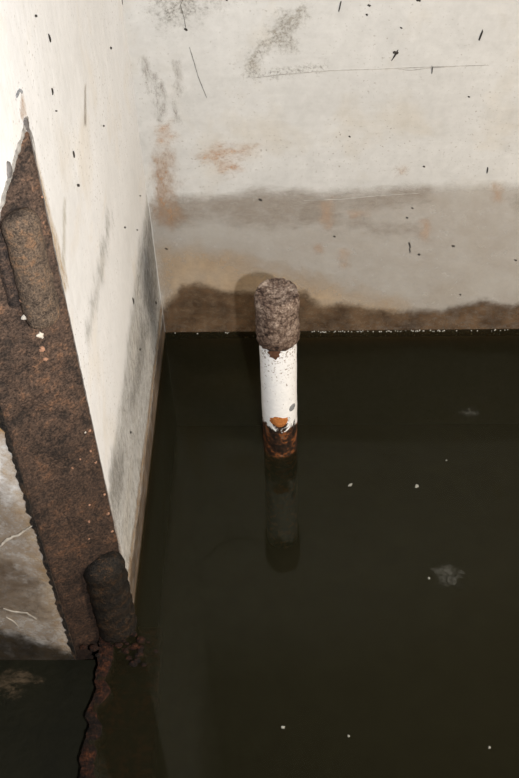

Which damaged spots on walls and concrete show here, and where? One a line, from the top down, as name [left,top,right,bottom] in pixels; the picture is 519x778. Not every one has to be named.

rust [270,417,288,427]
water stain [112,189,519,608]